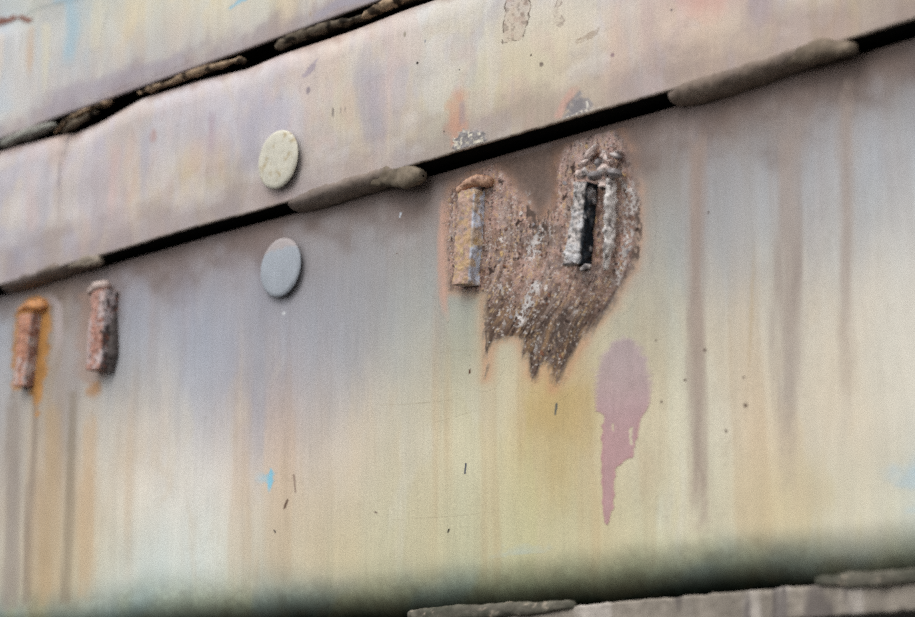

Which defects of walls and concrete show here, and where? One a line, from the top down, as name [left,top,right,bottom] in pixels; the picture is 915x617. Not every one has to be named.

peeling [501,0,532,45]
rust [0,291,103,611]
rust [429,126,657,525]
water stain [765,91,813,512]
water stain [832,65,859,455]